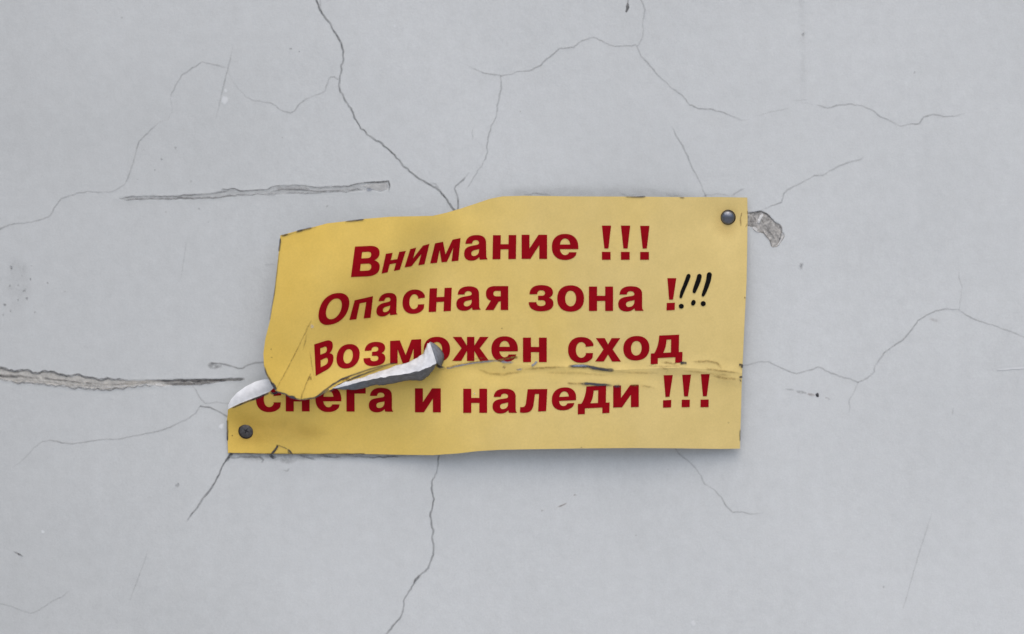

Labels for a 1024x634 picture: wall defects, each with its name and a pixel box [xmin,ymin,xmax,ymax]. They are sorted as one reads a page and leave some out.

spalling [747,211,784,247]